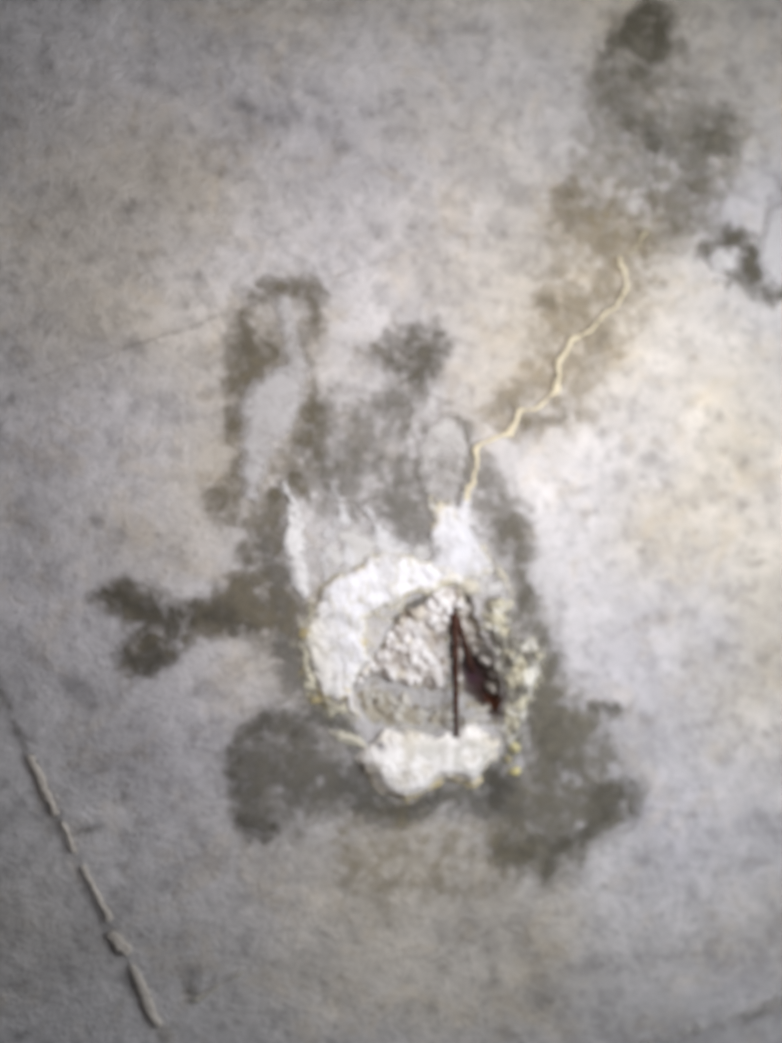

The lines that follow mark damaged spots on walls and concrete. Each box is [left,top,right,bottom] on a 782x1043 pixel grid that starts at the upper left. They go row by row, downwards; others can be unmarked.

damp [609,1,671,77]
damp [703,229,780,303]
damp [257,281,322,334]
damp [228,311,279,397]
damp [373,326,449,394]
crack [464,228,648,501]
damp [295,395,326,459]
damp [102,461,635,875]
spalling [353,584,503,735]
rust [461,645,504,713]